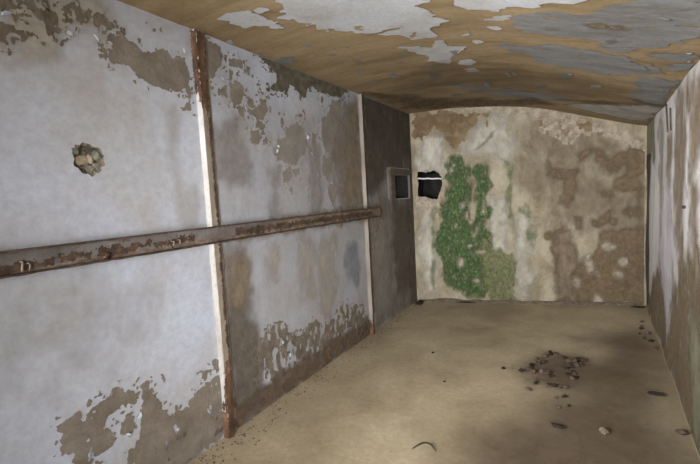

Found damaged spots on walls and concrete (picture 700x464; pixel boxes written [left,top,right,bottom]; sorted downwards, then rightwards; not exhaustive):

flaking render [71,142,105,177]
peeling [0,0,196,116]
rust [190,29,218,222]
peeling [217,0,700,170]
rust [0,234,195,276]
rust [235,205,378,242]
damp [223,54,578,409]
damp [544,76,700,456]
peeling [51,358,224,464]